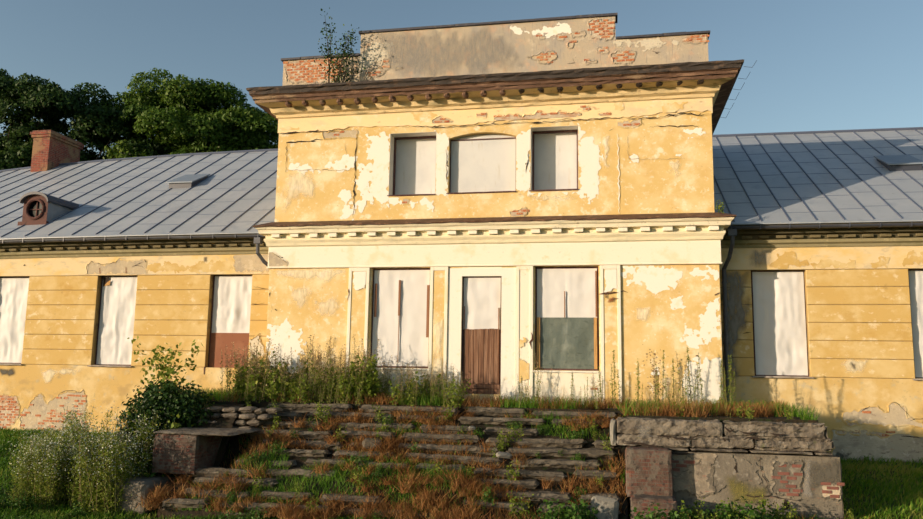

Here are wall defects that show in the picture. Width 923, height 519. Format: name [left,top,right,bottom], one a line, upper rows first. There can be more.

spalling [510,18,710,65]
peeling [683,127,706,139]
crack [280,129,357,212]
peeling [286,102,644,220]
peeling [604,265,719,310]
peeling [249,318,307,374]
peeling [651,297,723,404]
peeling [44,369,72,382]
flaking render [0,389,88,432]
flaking render [830,401,923,463]
crack [746,456,802,501]
spalling [819,480,845,502]